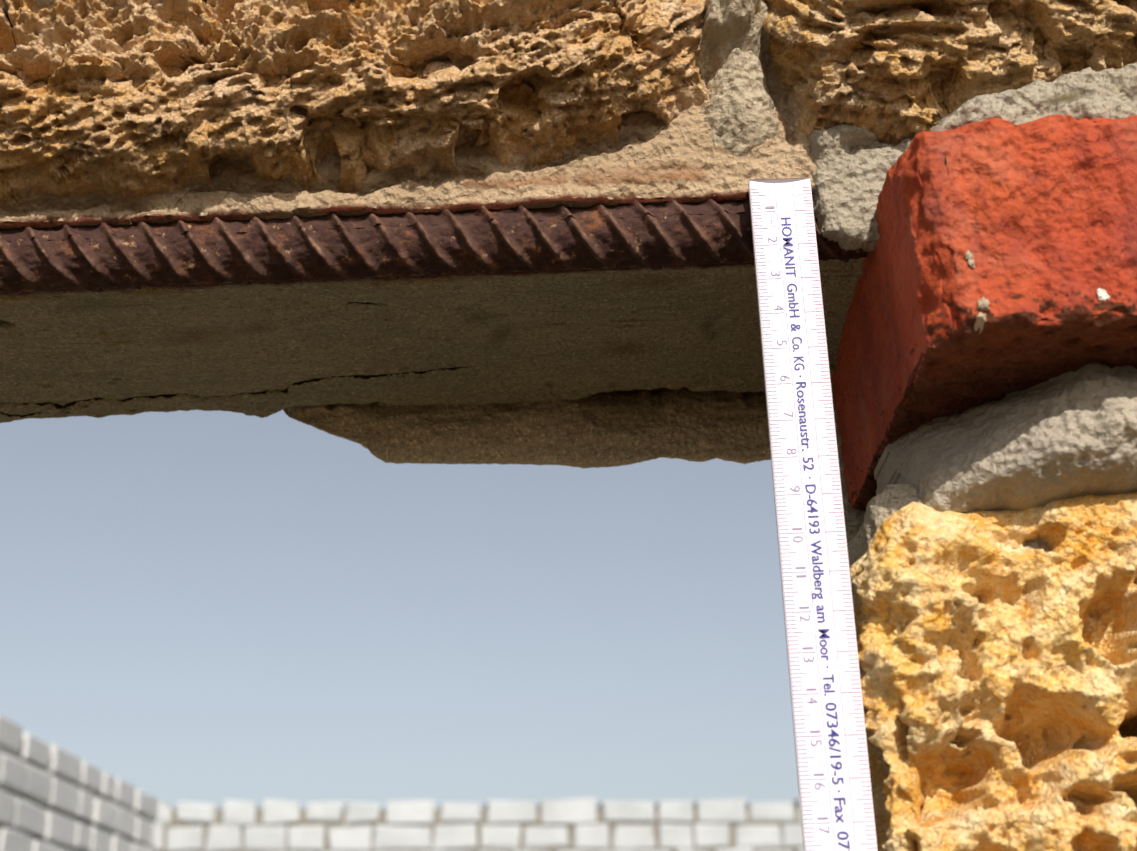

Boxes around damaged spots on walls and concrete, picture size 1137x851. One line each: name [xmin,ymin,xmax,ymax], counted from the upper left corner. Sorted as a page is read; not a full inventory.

crack [2,0,16,45]
corrosion [0,211,271,228]
corrosion [322,192,749,214]
crack [1,366,476,418]